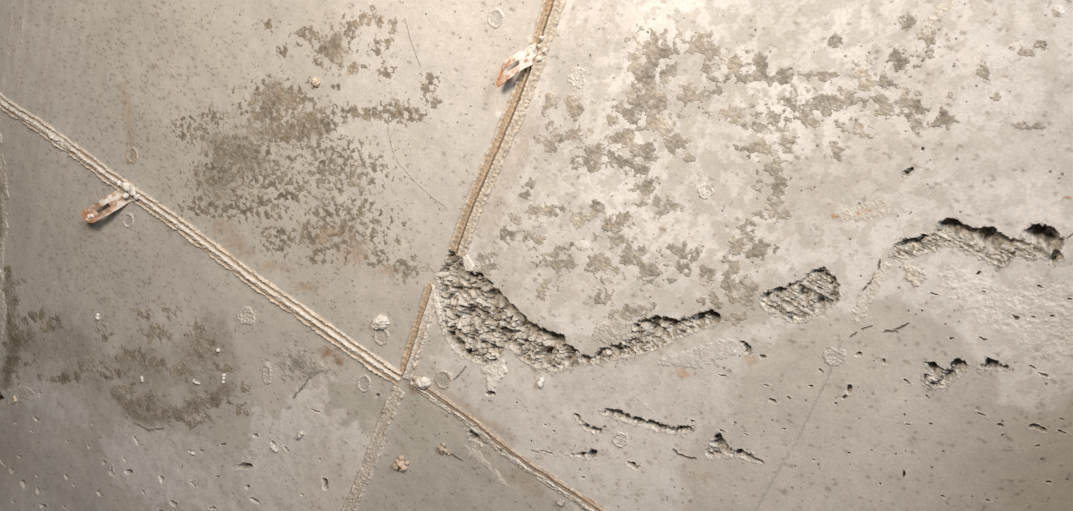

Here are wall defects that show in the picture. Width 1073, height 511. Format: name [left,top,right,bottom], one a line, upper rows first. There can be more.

peeling [976,60,1002,104]
peeling [1014,120,1046,132]
spalling [157,5,960,373]
spalling [887,216,1069,277]
peeling [0,262,260,429]
spalling [899,335,1056,400]
spalling [529,406,697,462]
spalling [702,421,766,465]